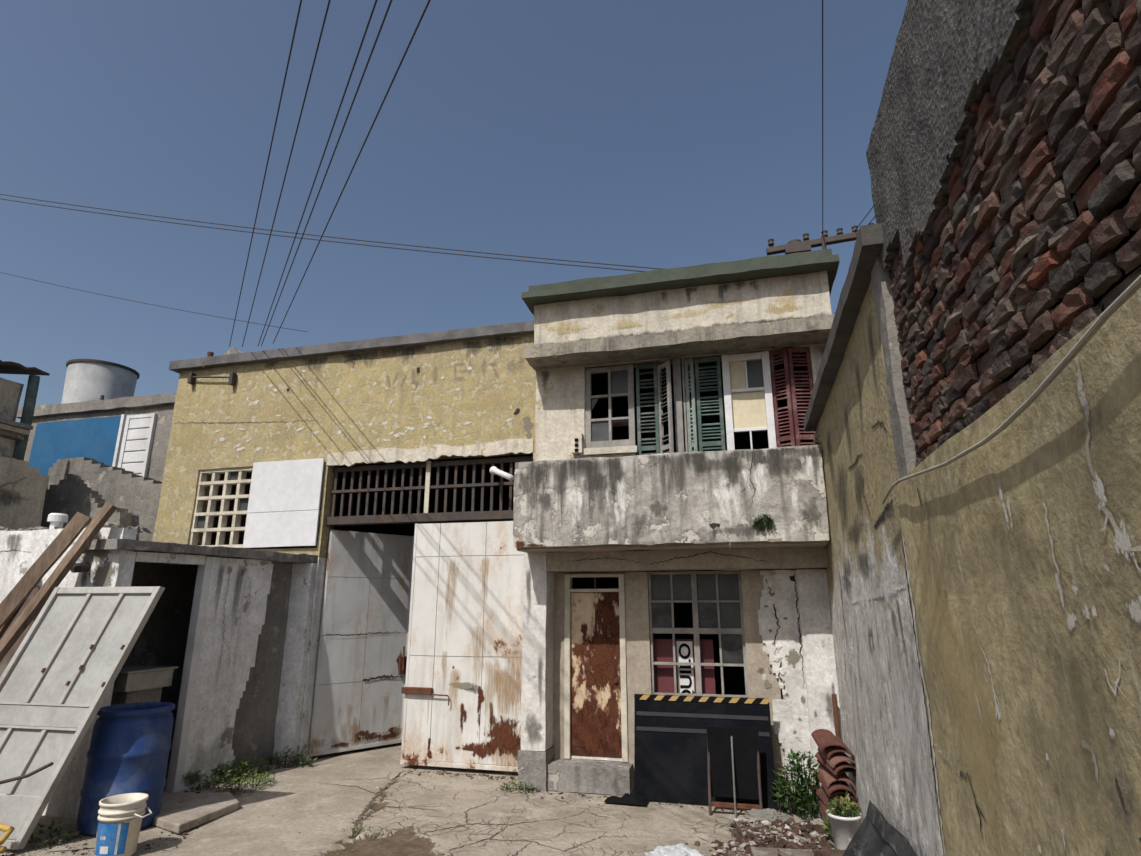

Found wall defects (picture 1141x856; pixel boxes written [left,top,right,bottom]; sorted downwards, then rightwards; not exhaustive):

water stain [520,458,626,526]
water stain [649,436,863,541]
rust [331,727,400,748]
rust [363,652,401,682]
rust [456,686,521,759]
rust [571,586,622,760]
peeling [759,579,791,699]
water stain [787,649,801,668]
water stain [840,554,937,856]
crack [848,420,986,856]
crack [1043,501,1097,631]
peeling [1126,596,1141,624]